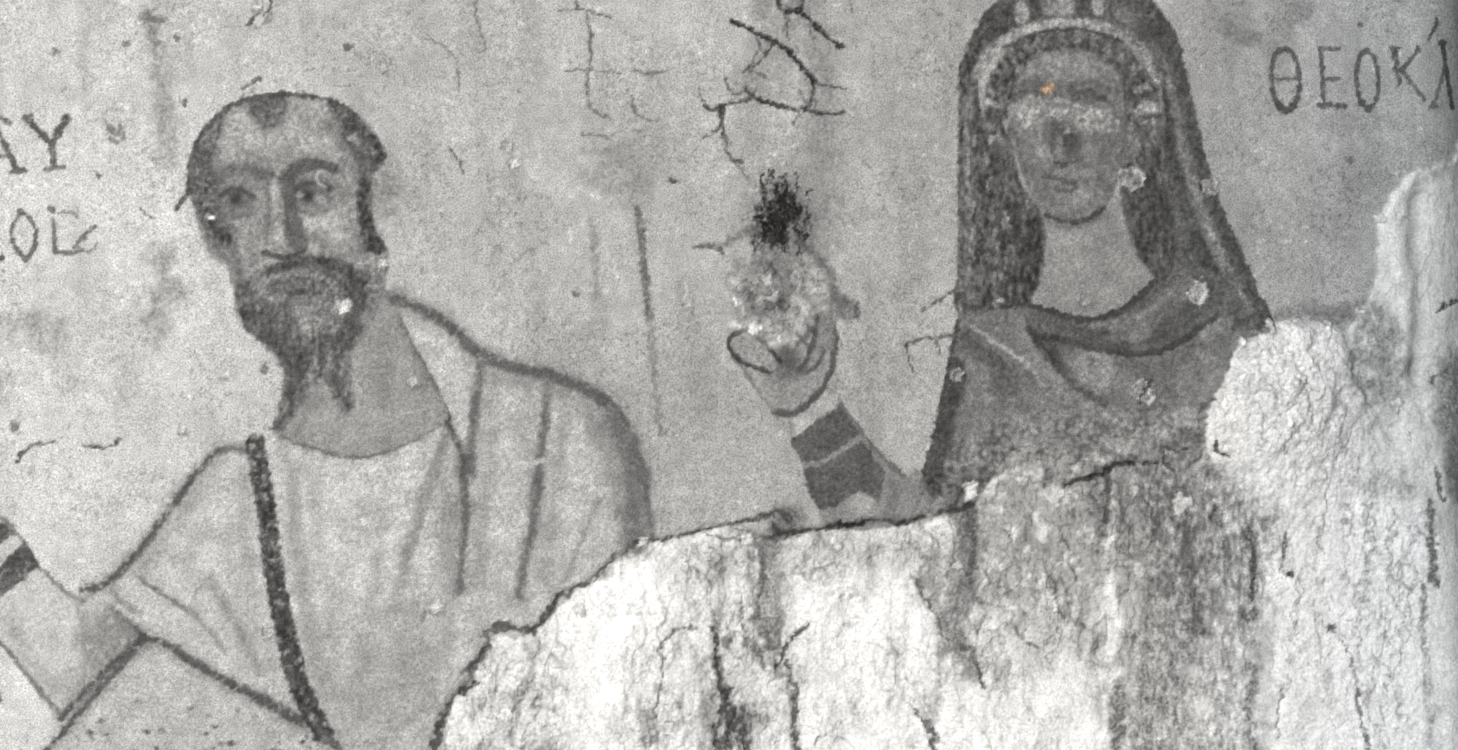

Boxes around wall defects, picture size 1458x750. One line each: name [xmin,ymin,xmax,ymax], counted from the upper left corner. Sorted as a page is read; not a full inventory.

crack [701,0,852,177]
peeling [1119,168,1146,191]
peeling [1201,178,1219,195]
spalling [726,253,832,346]
peeling [1187,281,1207,305]
peeling [1132,379,1155,405]
spalling [1347,143,1458,750]
spalling [441,447,1269,750]